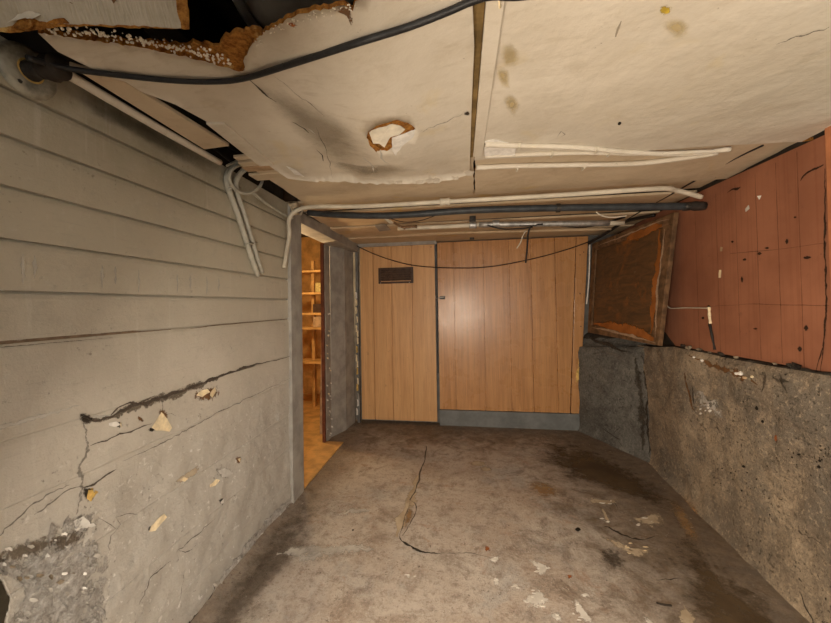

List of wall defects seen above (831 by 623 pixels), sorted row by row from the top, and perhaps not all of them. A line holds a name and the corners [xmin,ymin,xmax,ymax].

crack [0,356,290,446]
crack [34,379,288,515]
crack [395,446,490,558]
flaking render [0,514,108,623]